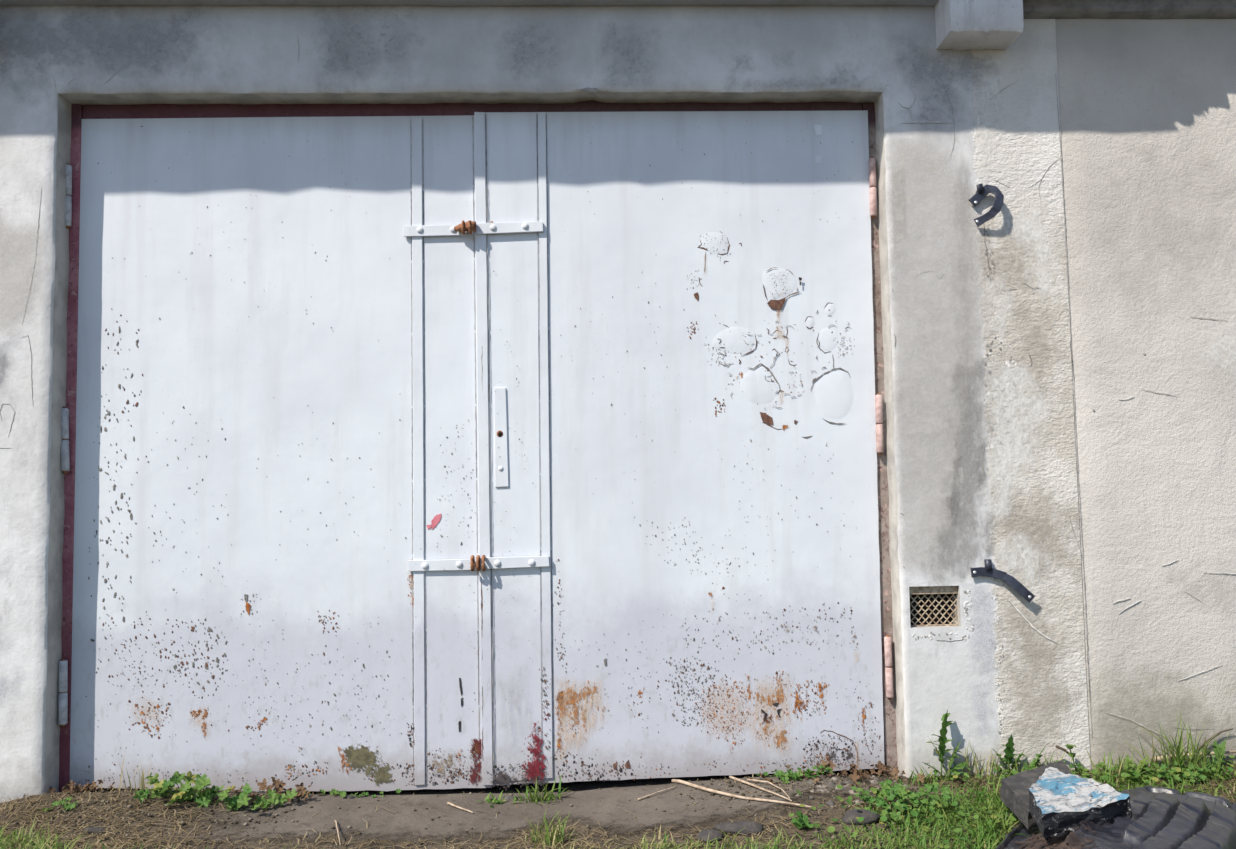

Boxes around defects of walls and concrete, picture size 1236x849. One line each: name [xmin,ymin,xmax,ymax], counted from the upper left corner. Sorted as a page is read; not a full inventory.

peeling [714,315,849,430]
water stain [890,144,992,570]
rust [128,697,171,739]
rust [521,680,605,783]
rust [701,671,829,753]